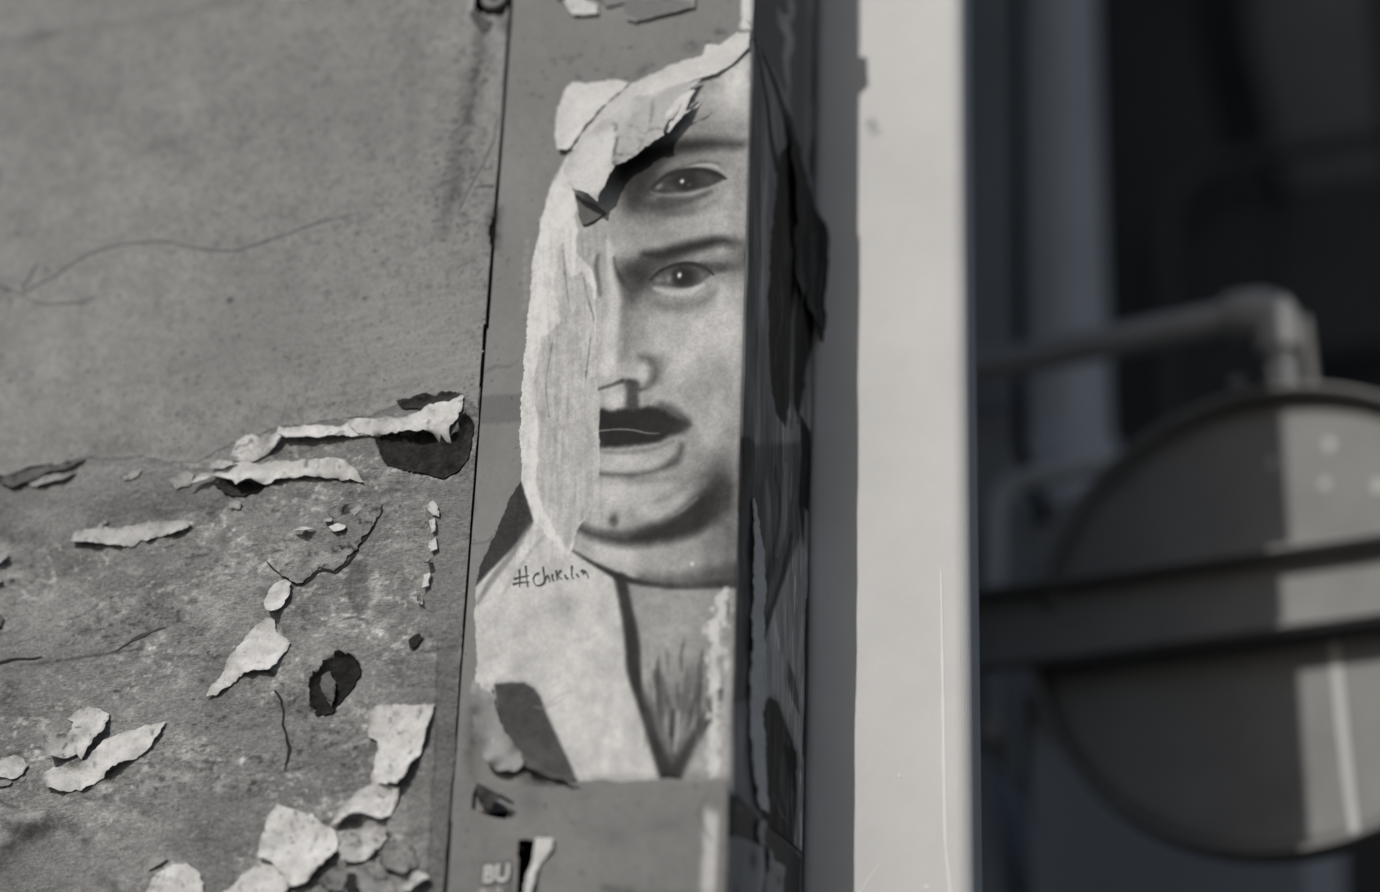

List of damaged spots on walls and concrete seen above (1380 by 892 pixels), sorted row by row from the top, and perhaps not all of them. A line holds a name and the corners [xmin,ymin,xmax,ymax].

crack [0,213,358,305]
peeling [0,458,85,487]
peeling [169,395,464,509]
peeling [70,518,191,547]
peeling [416,500,440,605]
peeling [206,501,382,697]
spalling [320,671,336,708]
peeling [0,706,167,792]
peeling [223,704,436,892]
peeling [146,853,204,892]